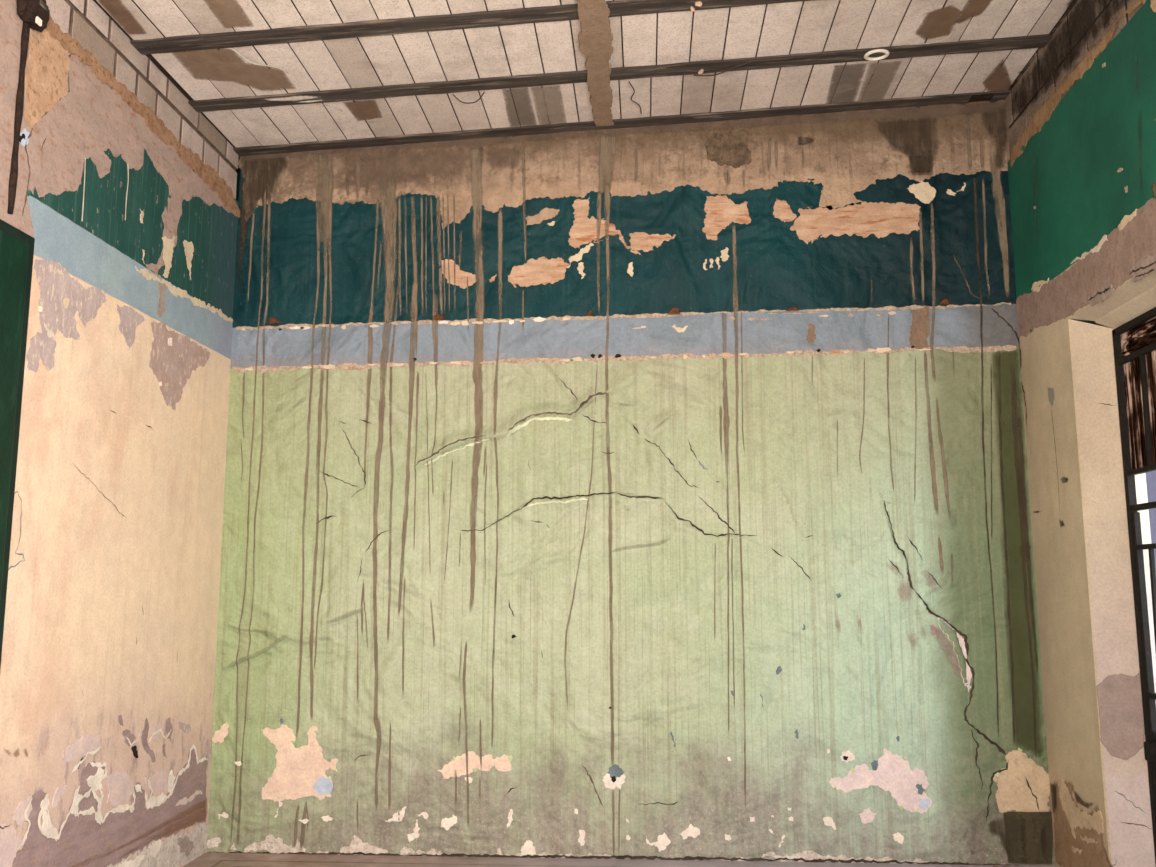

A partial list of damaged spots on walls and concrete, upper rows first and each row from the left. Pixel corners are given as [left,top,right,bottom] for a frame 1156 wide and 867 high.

water stain [99,0,145,34]
water stain [204,0,252,28]
water stain [173,48,293,91]
peeling [0,0,1156,410]
water stain [230,0,1127,858]
crack [461,379,812,580]
crack [884,501,1040,822]
water stain [1096,673,1145,760]
peeling [0,715,208,867]
peeling [262,718,338,818]
peeling [827,736,932,814]
flaking render [993,748,1050,813]